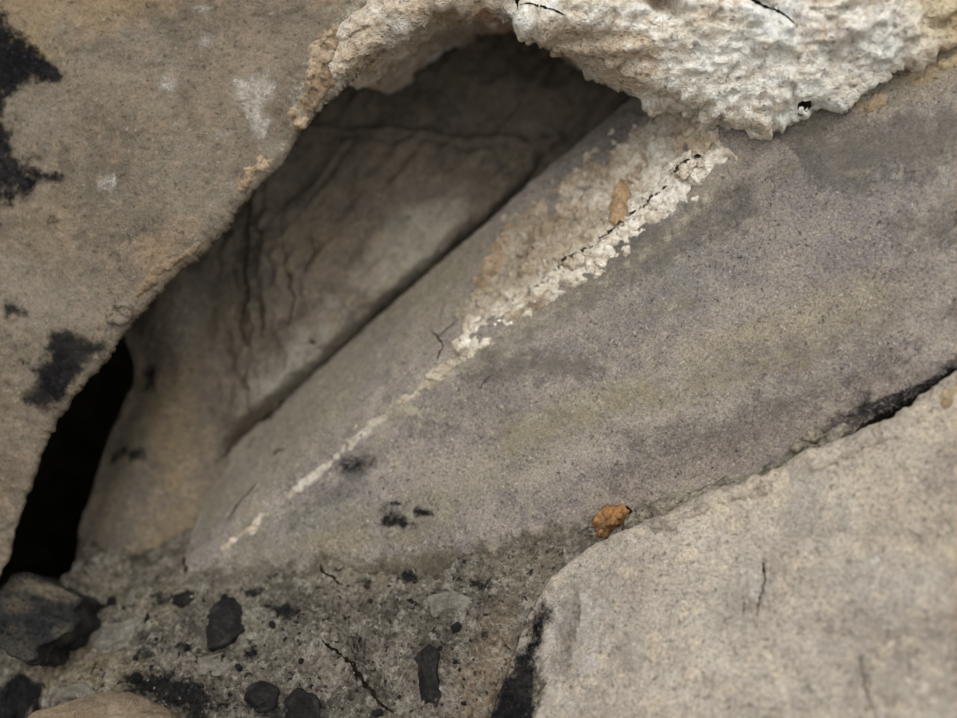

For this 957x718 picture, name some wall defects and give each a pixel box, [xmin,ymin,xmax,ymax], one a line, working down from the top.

water stain [0,7,64,207]
spalling [286,25,383,138]
spalling [797,100,814,117]
spalling [236,155,273,194]
water stain [4,304,27,318]
spalling [103,236,209,327]
spalling [287,112,738,500]
water stain [21,330,105,409]
crack [856,368,957,431]
spalling [220,513,269,551]
spalling [649,480,773,534]
spalling [743,562,766,614]